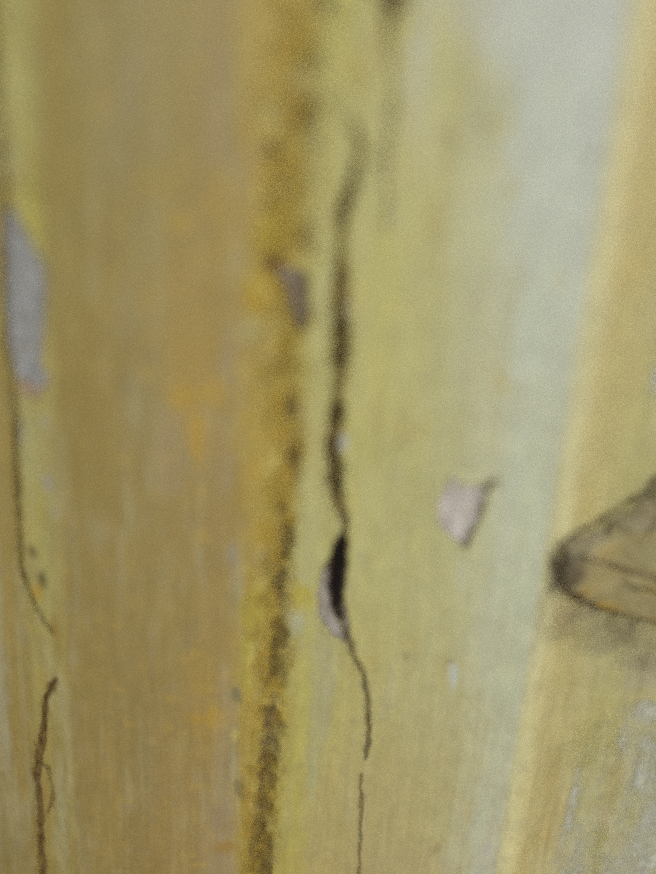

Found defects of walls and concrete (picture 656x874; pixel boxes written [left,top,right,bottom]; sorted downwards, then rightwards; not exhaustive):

peeling [3,183,48,400]
crack [327,117,371,874]
peeling [437,477,494,549]
crack [32,677,58,874]